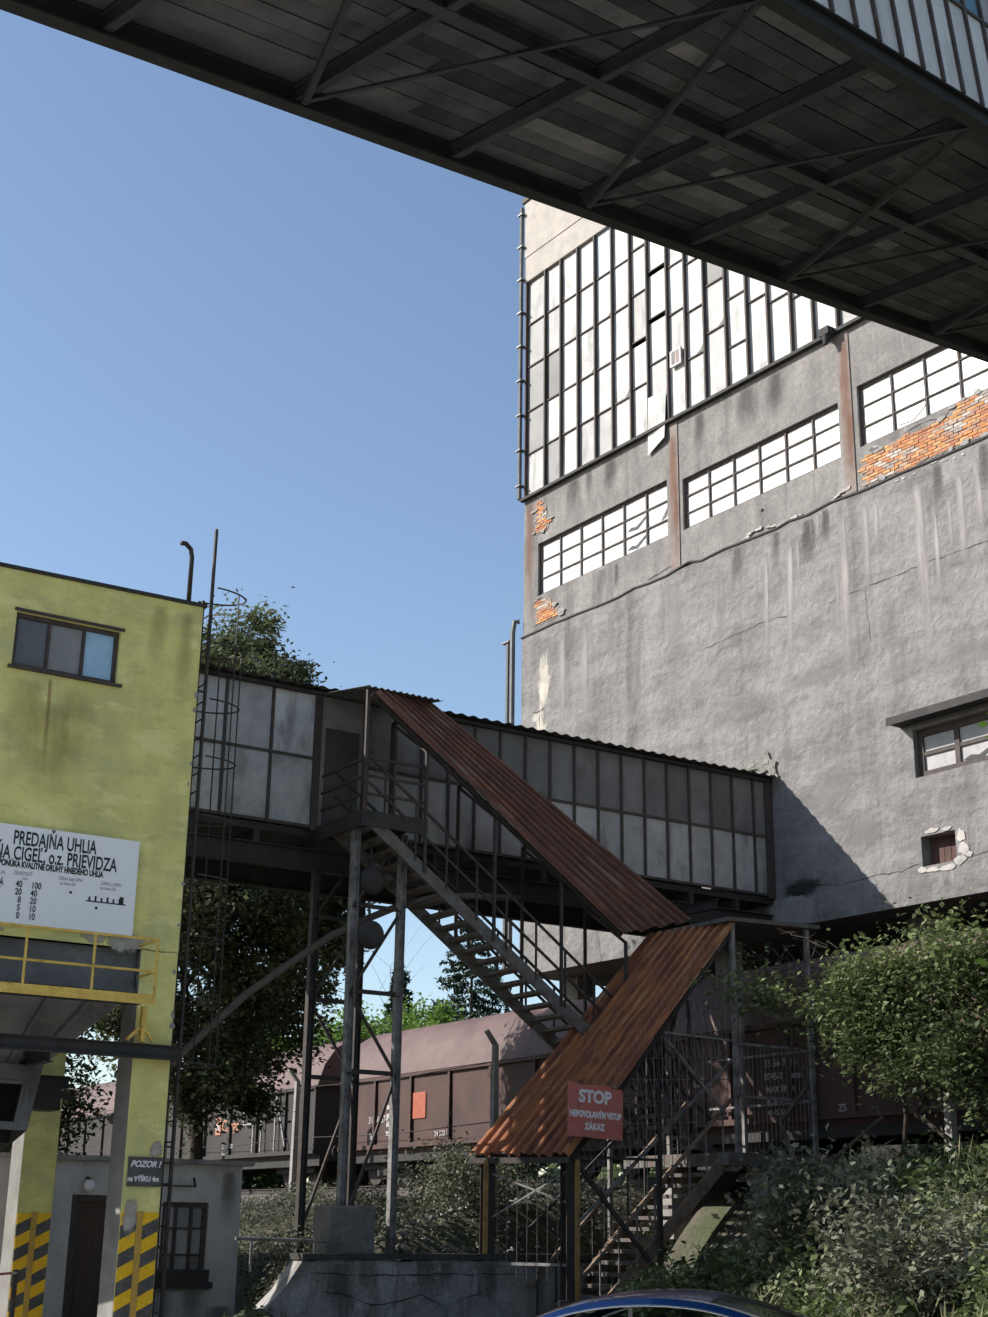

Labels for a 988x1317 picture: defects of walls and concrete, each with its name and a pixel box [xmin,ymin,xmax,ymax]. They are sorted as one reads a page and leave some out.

flaking render [832,388,988,500]
flaking render [530,497,554,535]
flaking render [533,596,565,626]
damp [787,541,800,637]
damp [810,513,849,626]
damp [862,504,878,576]
damp [914,461,983,598]
spalling [918,826,973,873]
crack [311,1272,521,1317]